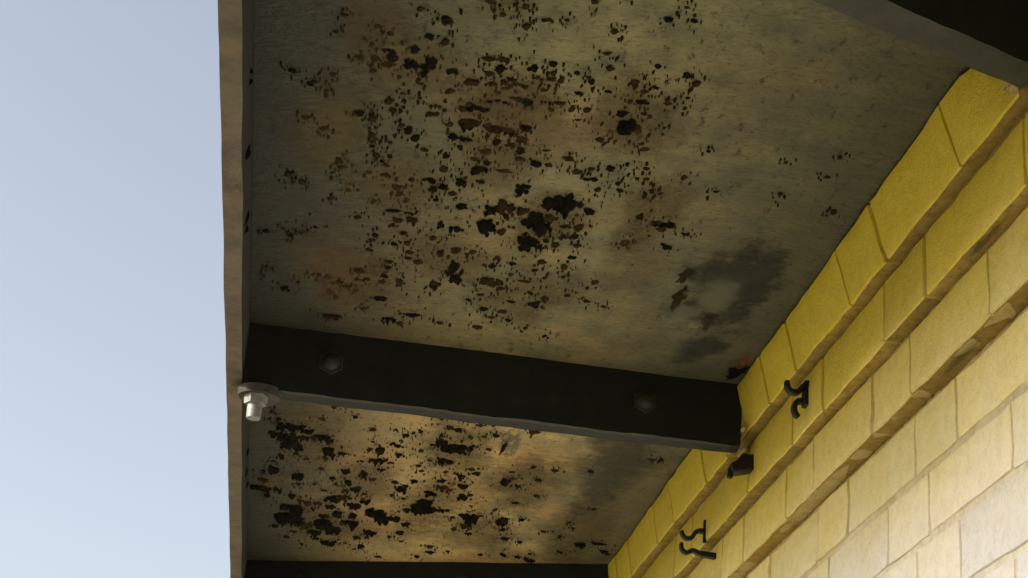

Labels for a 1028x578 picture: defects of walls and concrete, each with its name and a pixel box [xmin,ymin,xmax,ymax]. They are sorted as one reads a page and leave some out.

peeling [498,429,522,456]